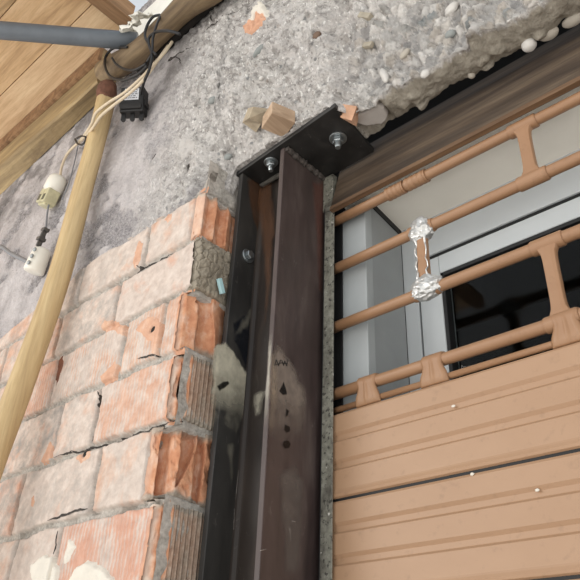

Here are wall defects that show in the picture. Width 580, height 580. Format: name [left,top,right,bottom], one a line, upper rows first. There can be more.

spalling [366,40,549,143]
crack [136,254,171,274]
crack [56,420,183,460]
crack [50,505,94,554]